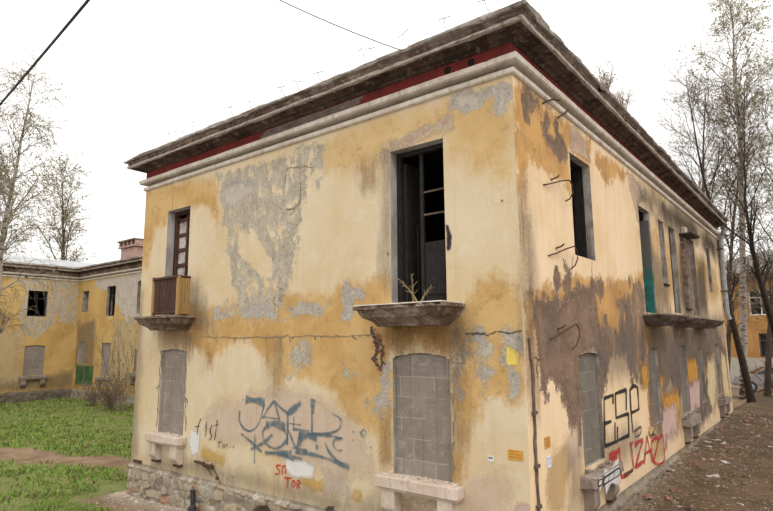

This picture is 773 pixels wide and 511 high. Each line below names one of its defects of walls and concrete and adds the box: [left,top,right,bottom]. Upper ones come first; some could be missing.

spalling [127,7,727,223]
crack [154,349,162,427]
crack [187,326,385,370]
peeling [0,74,732,500]
crack [465,329,522,337]
water stain [533,259,723,446]